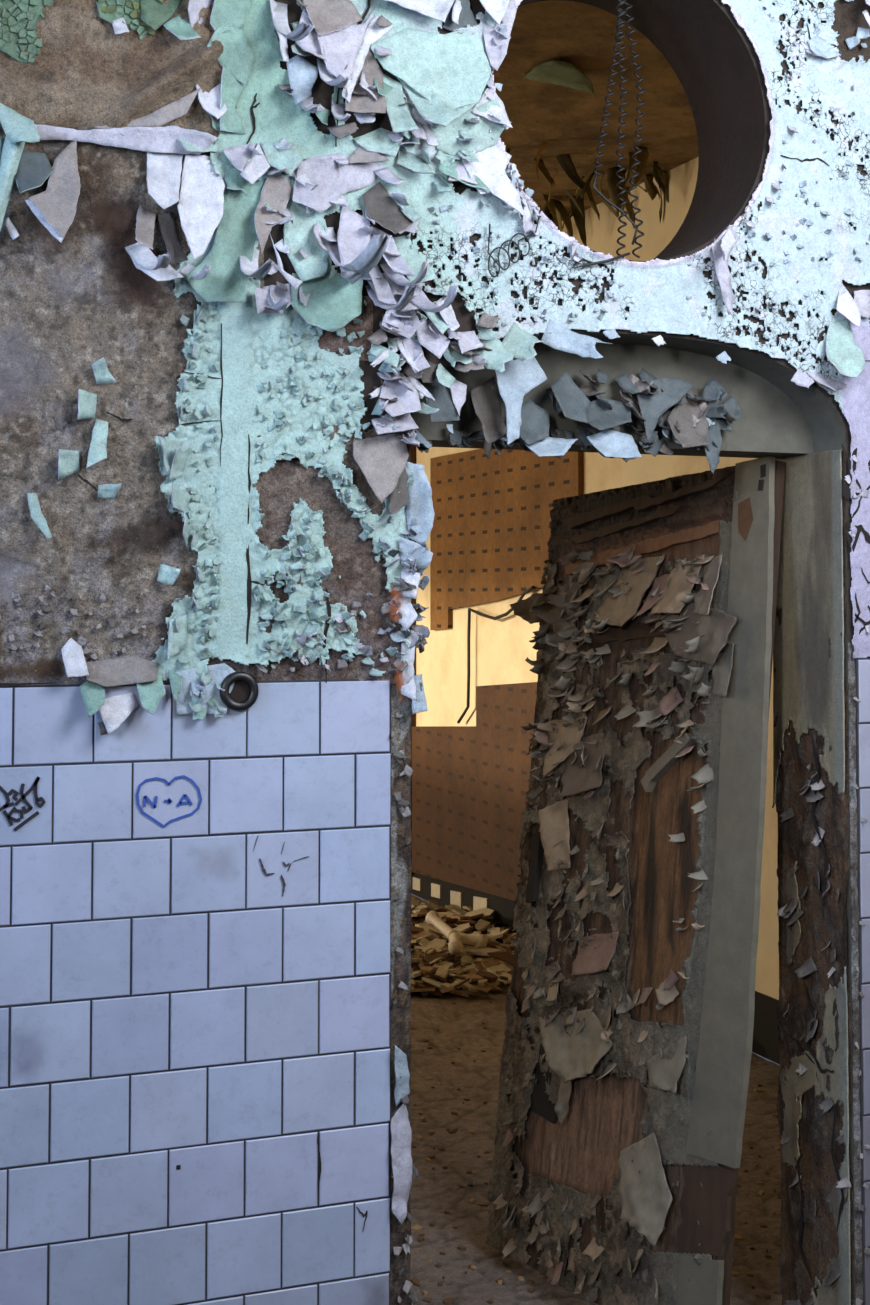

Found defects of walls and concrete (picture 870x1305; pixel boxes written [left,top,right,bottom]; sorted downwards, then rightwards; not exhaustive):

flaking render [782,0,870,63]
peeling [597,146,669,229]
peeling [687,160,865,316]
peeling [594,280,624,321]
peeling [603,330,620,339]
peeling [716,351,731,364]
peeling [790,282,870,392]
peeling [546,368,742,474]
crack [841,444,870,634]
flaking render [0,0,613,1305]
peeling [772,448,870,1305]